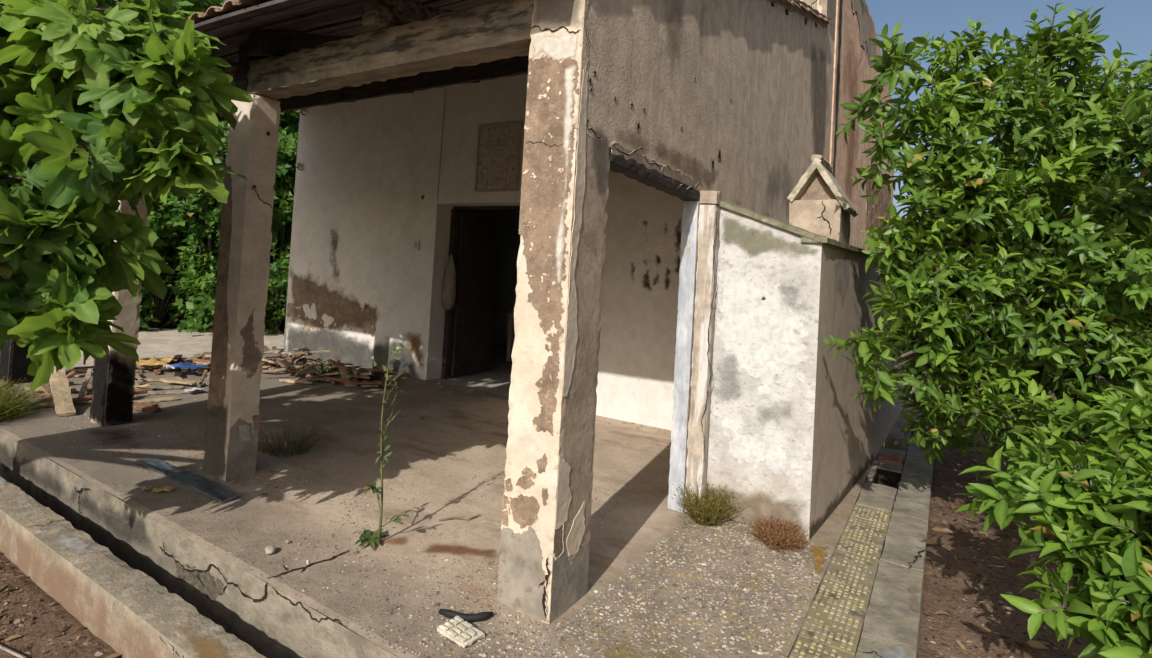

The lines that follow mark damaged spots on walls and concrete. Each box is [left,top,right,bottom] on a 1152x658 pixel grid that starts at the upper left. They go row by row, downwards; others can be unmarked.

crack [529,0,594,72]
crack [586,115,703,190]
flaking render [207,165,262,410]
flaking render [286,300,378,337]
peeling [716,271,814,395]
peeling [713,411,805,476]
crack [160,542,349,627]
flaking render [497,453,590,624]
crack [907,549,926,569]